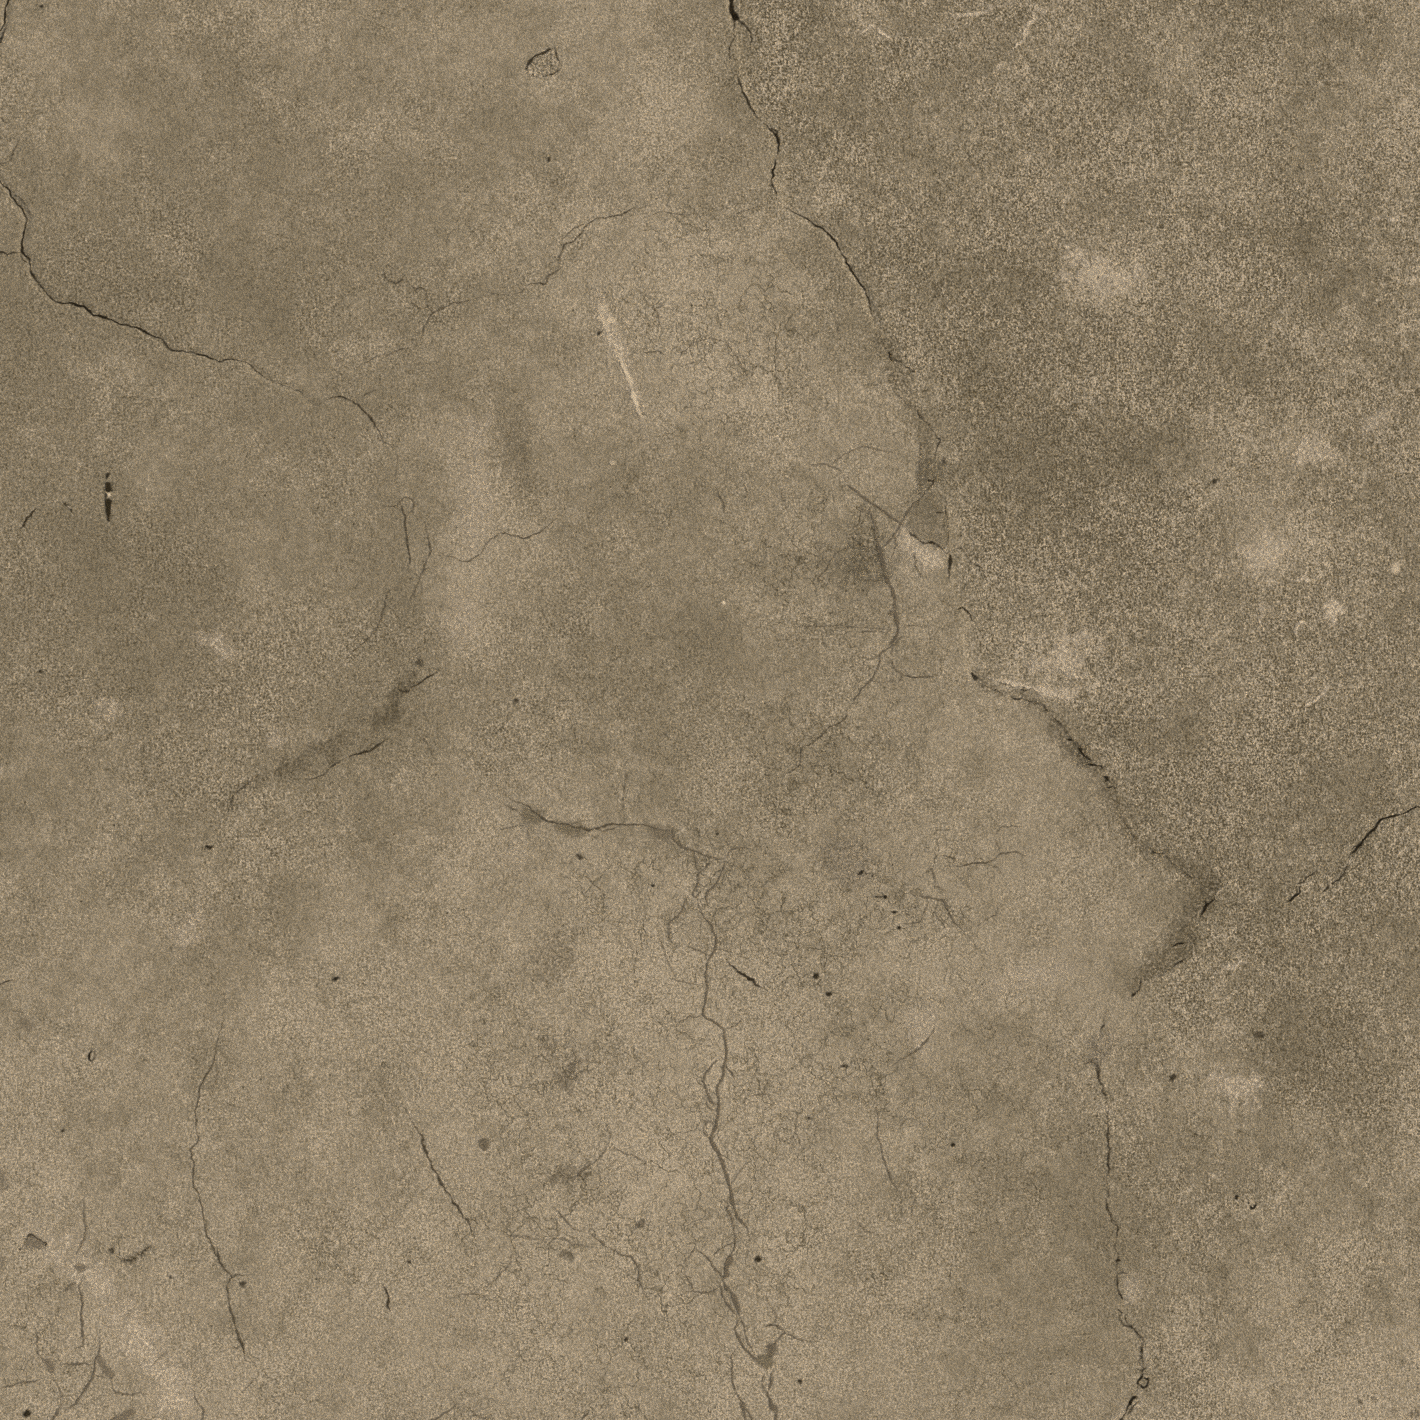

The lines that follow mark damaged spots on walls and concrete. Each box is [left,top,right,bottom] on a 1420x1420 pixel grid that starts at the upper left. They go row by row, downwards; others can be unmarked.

crack [0,0,10,43]
crack [729,0,874,317]
crack [0,118,298,391]
crack [331,396,387,444]
crack [797,412,982,768]
crack [1060,723,1116,791]
crack [912,851,1018,930]
crack [1174,899,1215,965]
crack [1287,806,1420,903]
crack [900,1030,934,1060]
crack [513,773,804,1420]
crack [1096,981,1150,1420]